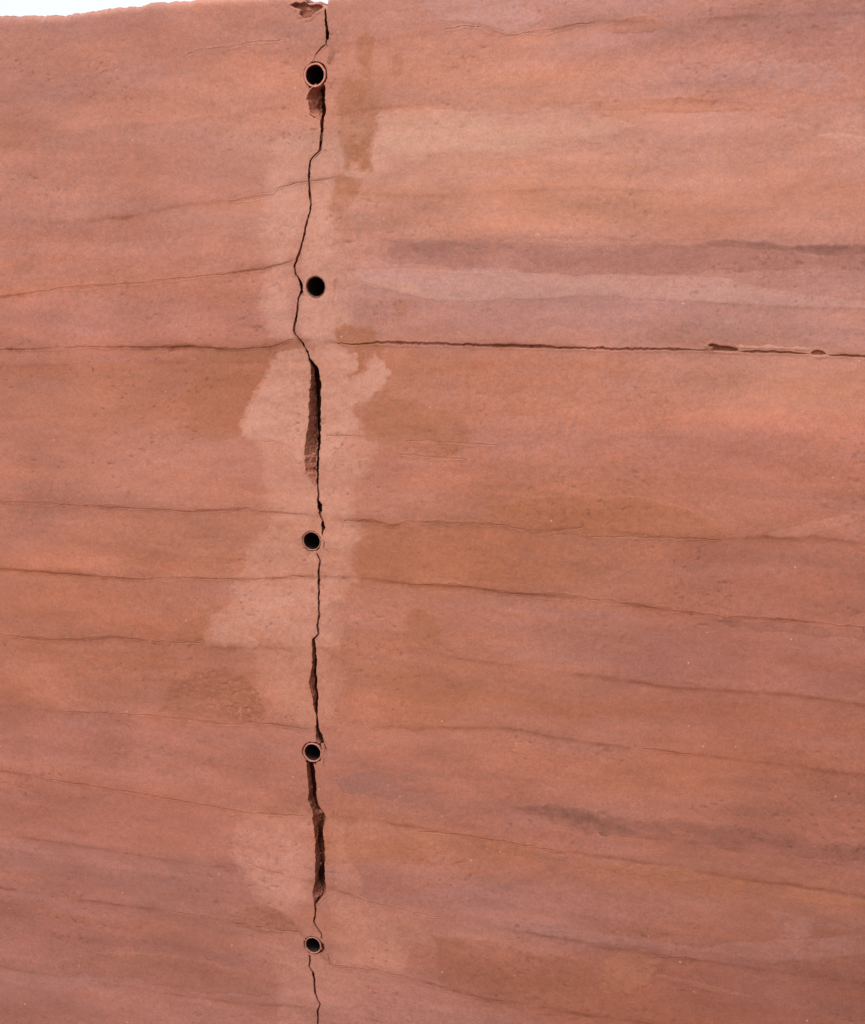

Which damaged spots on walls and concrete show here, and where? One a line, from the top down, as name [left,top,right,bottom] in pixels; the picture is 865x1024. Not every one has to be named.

spalling [287,0,327,22]
crack [312,6,331,60]
leakage [175,323,473,472]
crack [738,349,865,361]
crack [0,83,719,1024]
leakage [254,441,504,734]